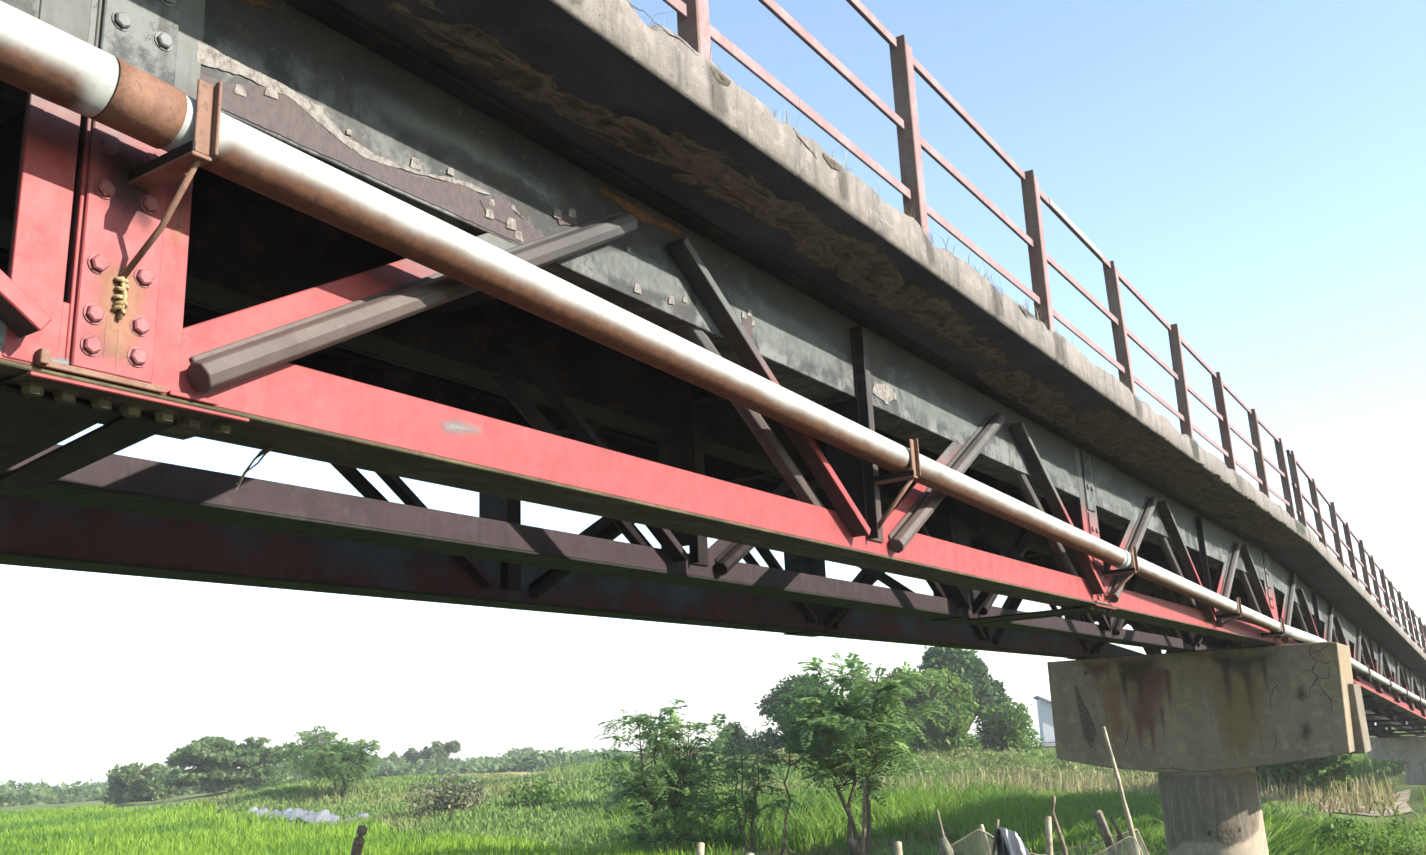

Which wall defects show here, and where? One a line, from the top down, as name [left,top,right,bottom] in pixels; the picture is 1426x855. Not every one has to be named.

peeling [196,40,545,244]
spalling [377,0,1312,549]
crack [1270,644,1338,751]